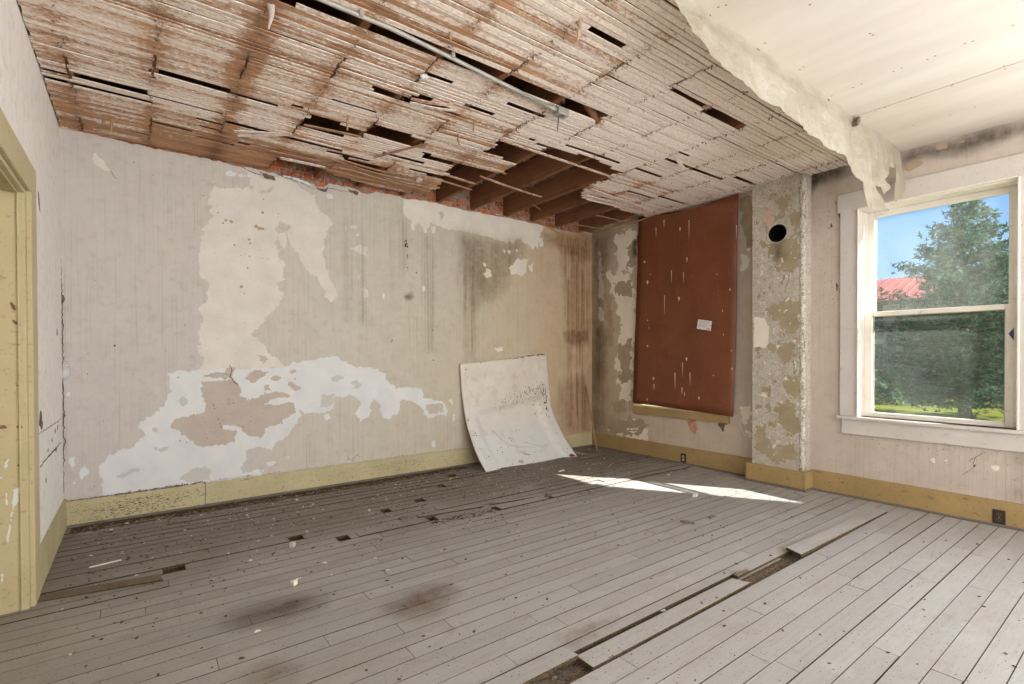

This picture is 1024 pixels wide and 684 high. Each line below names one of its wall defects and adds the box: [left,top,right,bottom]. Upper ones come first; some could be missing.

peeling [68,169,455,496]
peeling [403,199,545,277]
peeling [593,228,649,441]
peeling [739,187,806,464]